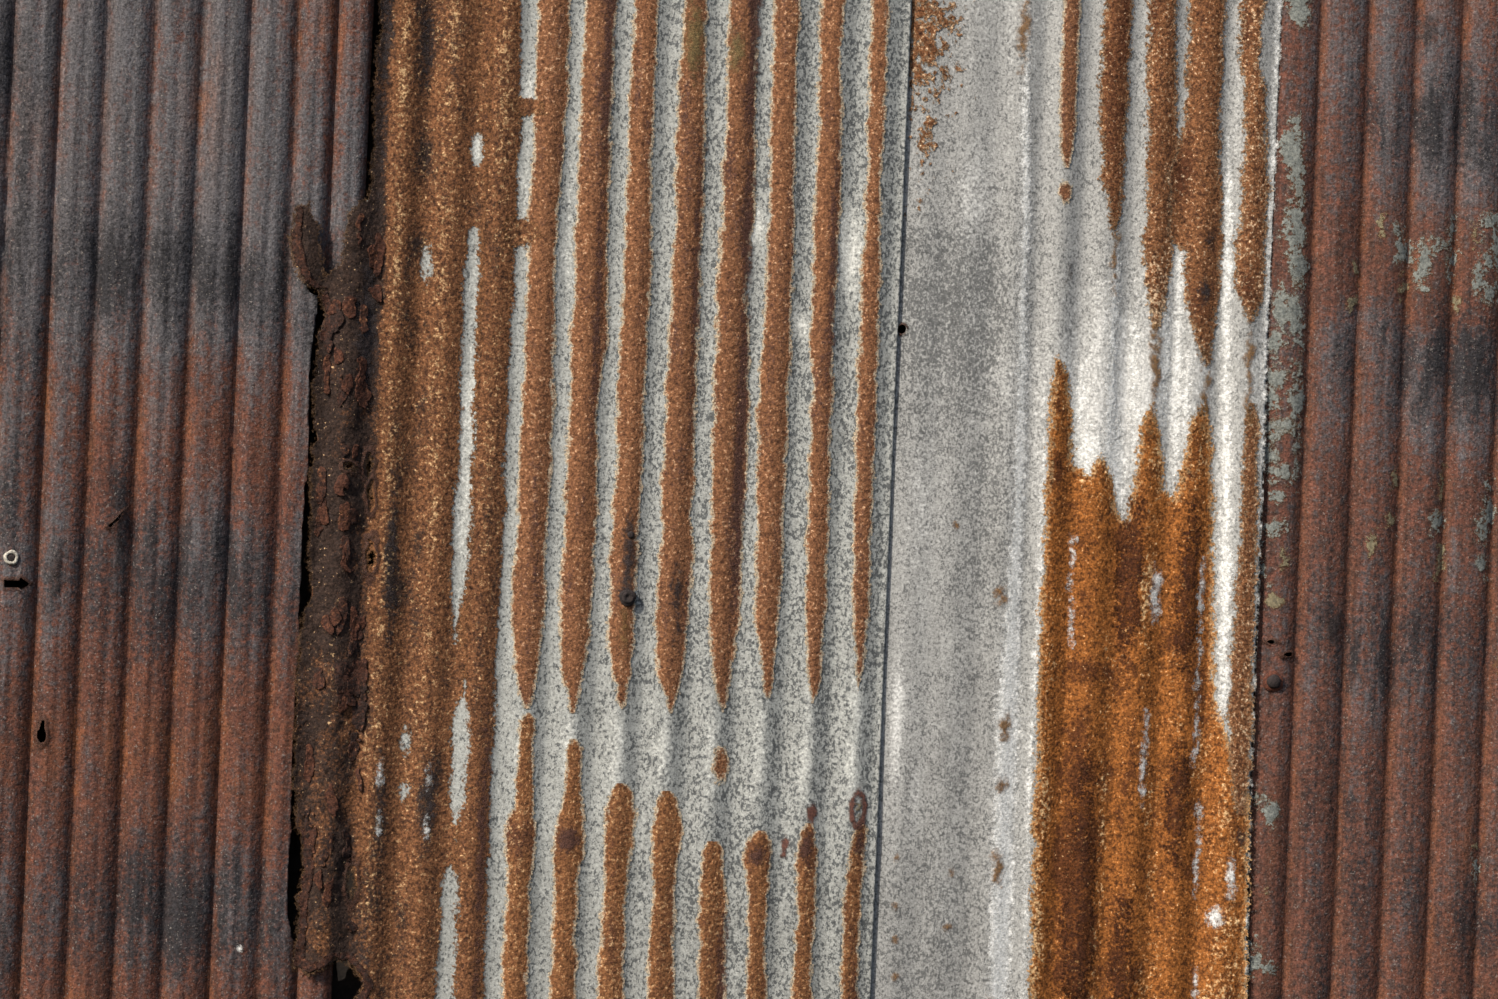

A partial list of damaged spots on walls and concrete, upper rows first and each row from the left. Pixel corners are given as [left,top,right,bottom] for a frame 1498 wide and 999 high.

corrosion [287,0,846,999]
corrosion [850,0,890,688]
corrosion [904,0,980,217]
corrosion [1025,0,1273,999]
peeling [1258,110,1310,609]
peeling [1376,202,1498,312]
corrosion [838,788,869,999]